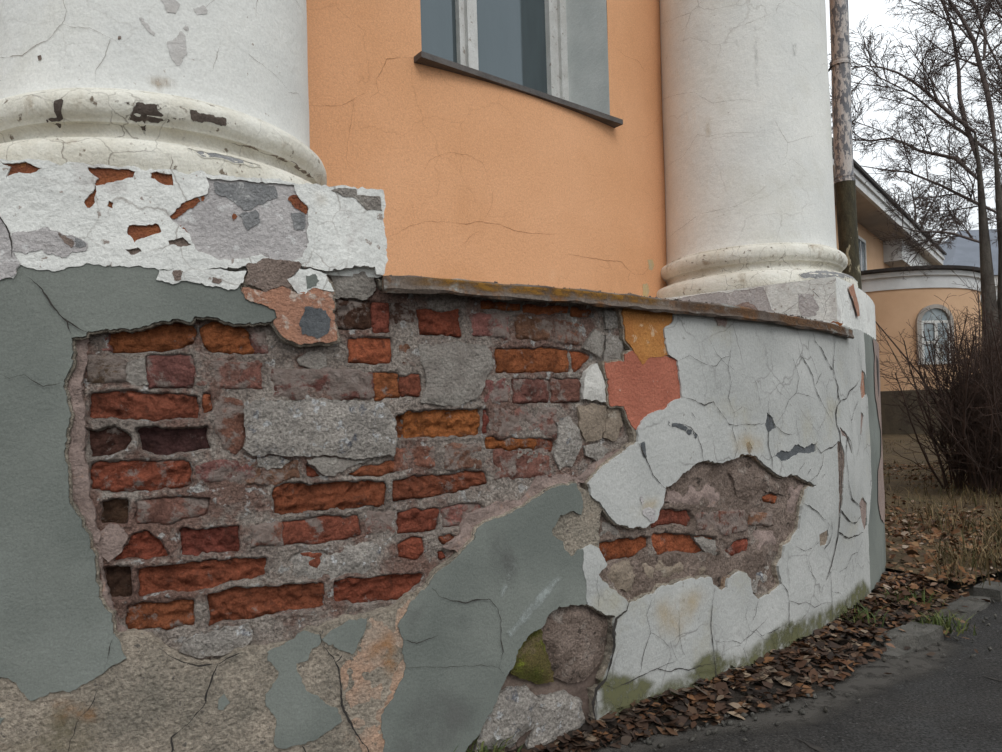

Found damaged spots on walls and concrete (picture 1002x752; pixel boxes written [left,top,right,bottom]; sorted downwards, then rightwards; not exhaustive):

crack [0,2,114,81]
peeling [46,99,63,128]
peeling [125,102,229,134]
peeling [2,162,40,176]
peeling [85,168,135,208]
peeling [151,172,173,185]
crack [233,143,313,178]
peeling [673,286,777,313]
spalling [0,178,680,752]
peeling [774,444,815,461]
spalling [598,442,807,601]
crack [591,288,869,724]